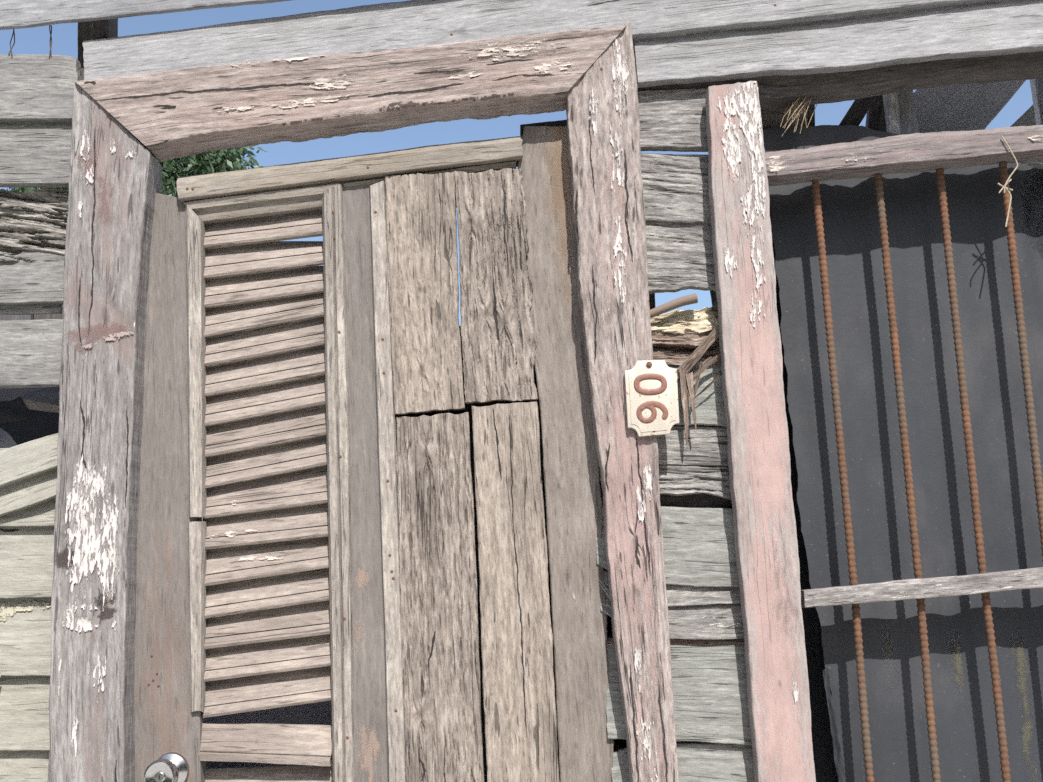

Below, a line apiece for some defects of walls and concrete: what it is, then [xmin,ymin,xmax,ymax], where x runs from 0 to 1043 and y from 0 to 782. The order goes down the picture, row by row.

peeling [464,38,571,73]
peeling [717,81,778,327]
peeling [62,453,119,632]
crack [493,409,527,733]
peeling [0,601,51,621]
crack [427,632,436,667]
crack [419,745,446,782]